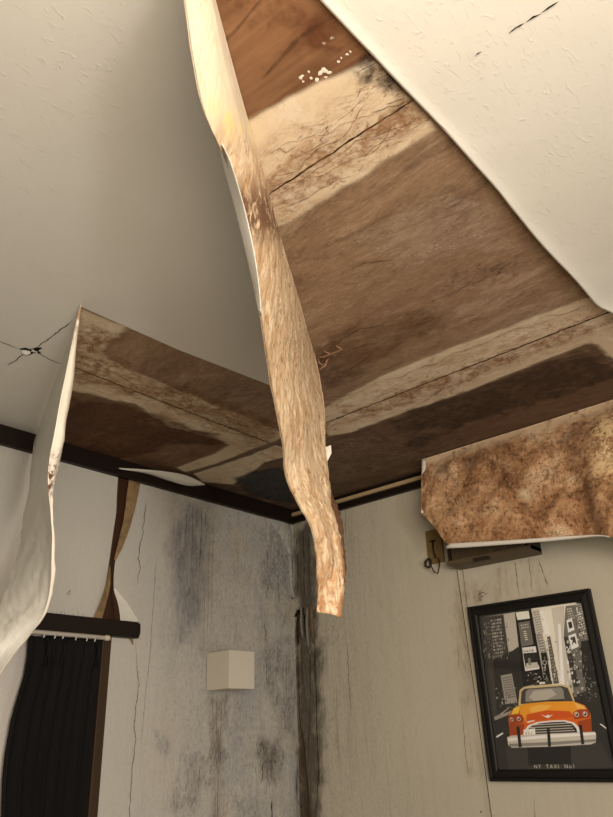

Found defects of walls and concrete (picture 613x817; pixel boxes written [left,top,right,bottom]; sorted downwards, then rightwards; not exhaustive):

leakage [362,58,398,89]
crack [510,1,559,33]
crack [271,100,413,193]
crack [0,321,271,444]
leakage [327,358,613,482]
crack [129,645,140,816]
leakage [293,523,321,817]